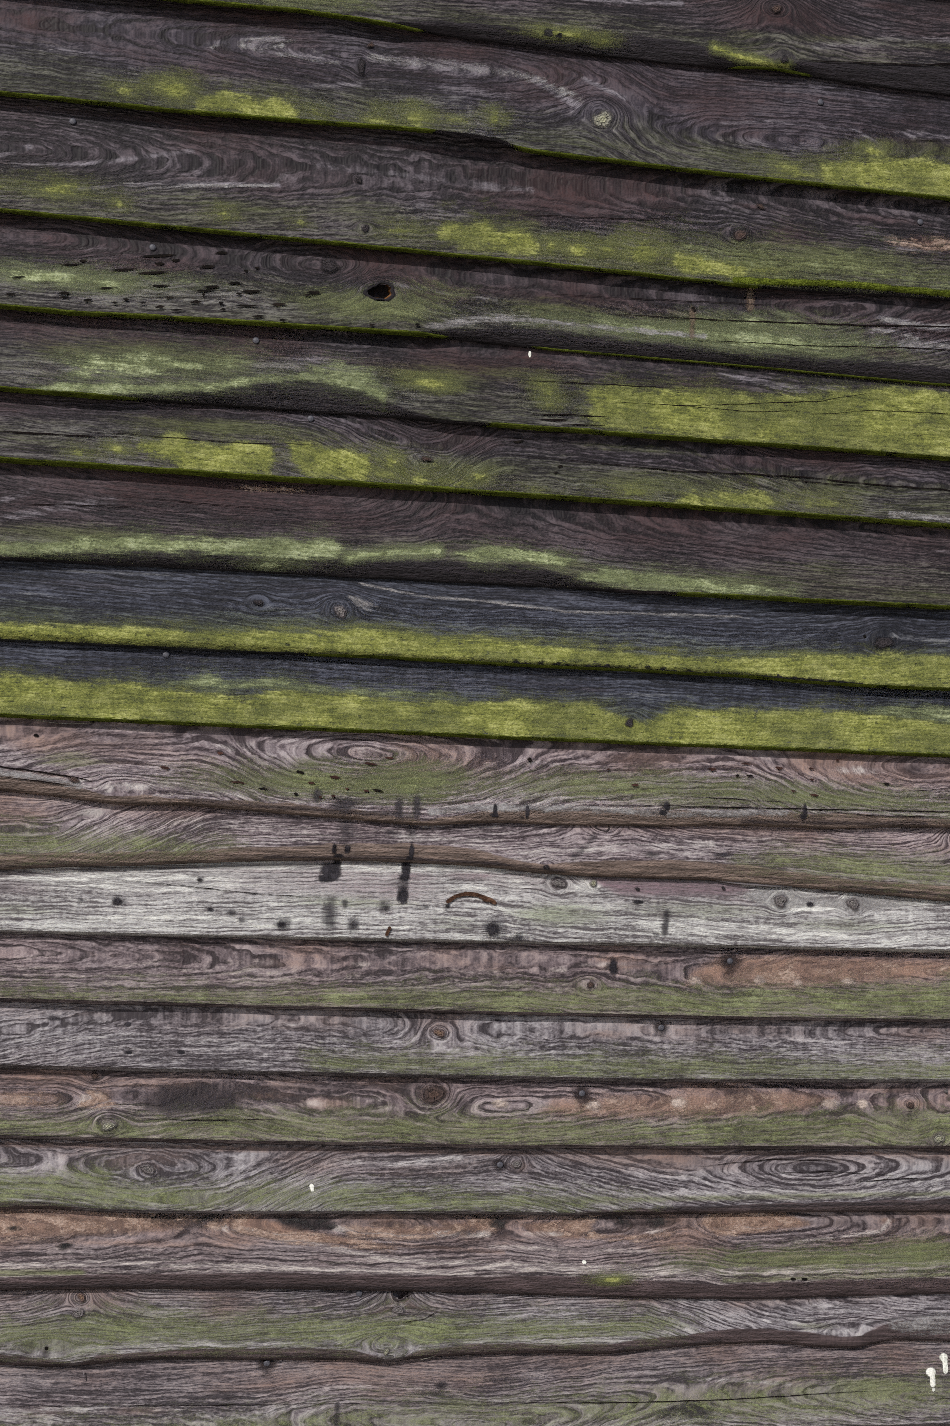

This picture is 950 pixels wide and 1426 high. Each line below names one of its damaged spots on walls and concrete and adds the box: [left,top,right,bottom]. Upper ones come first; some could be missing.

damp [397,862,411,904]